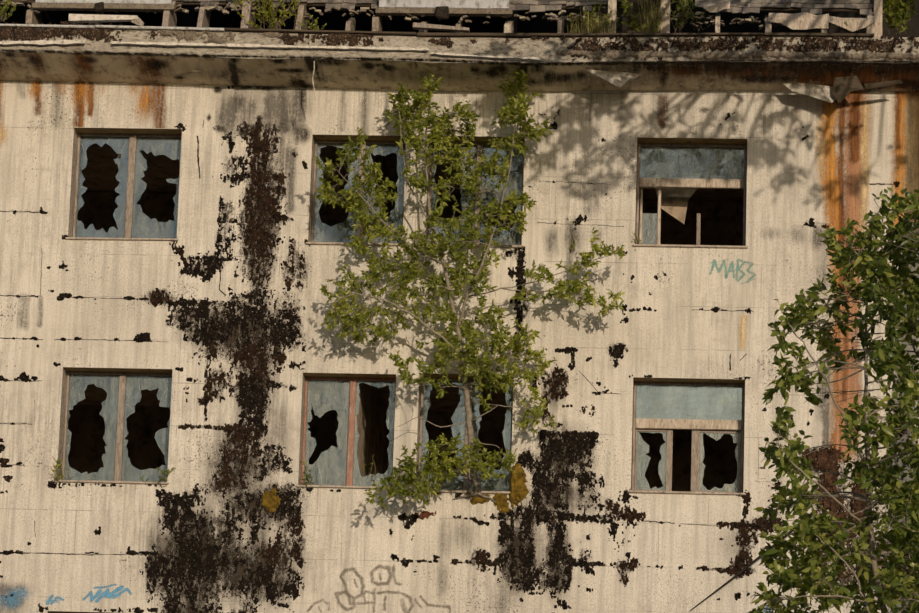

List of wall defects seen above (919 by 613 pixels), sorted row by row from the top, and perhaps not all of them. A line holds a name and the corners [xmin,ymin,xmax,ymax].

rust [74,82,94,127]
leakage [0,49,919,212]
rust [893,91,919,228]
leakage [548,225,579,269]
rust [819,91,869,460]
leakage [207,316,272,397]
leakage [541,434,583,514]
leakage [151,510,289,613]
leakage [505,527,535,581]